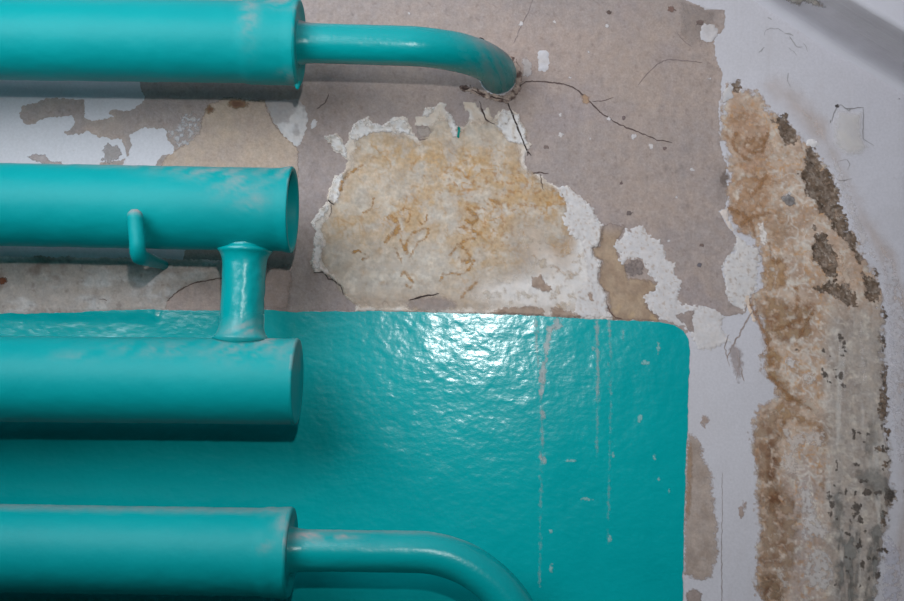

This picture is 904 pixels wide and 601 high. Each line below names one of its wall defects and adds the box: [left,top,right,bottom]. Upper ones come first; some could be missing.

peeling [19,0,761,351]
crack [479,101,549,189]
crack [523,81,672,143]
leakage [720,83,904,601]
peeling [684,435,719,580]
peeling [686,590,702,601]